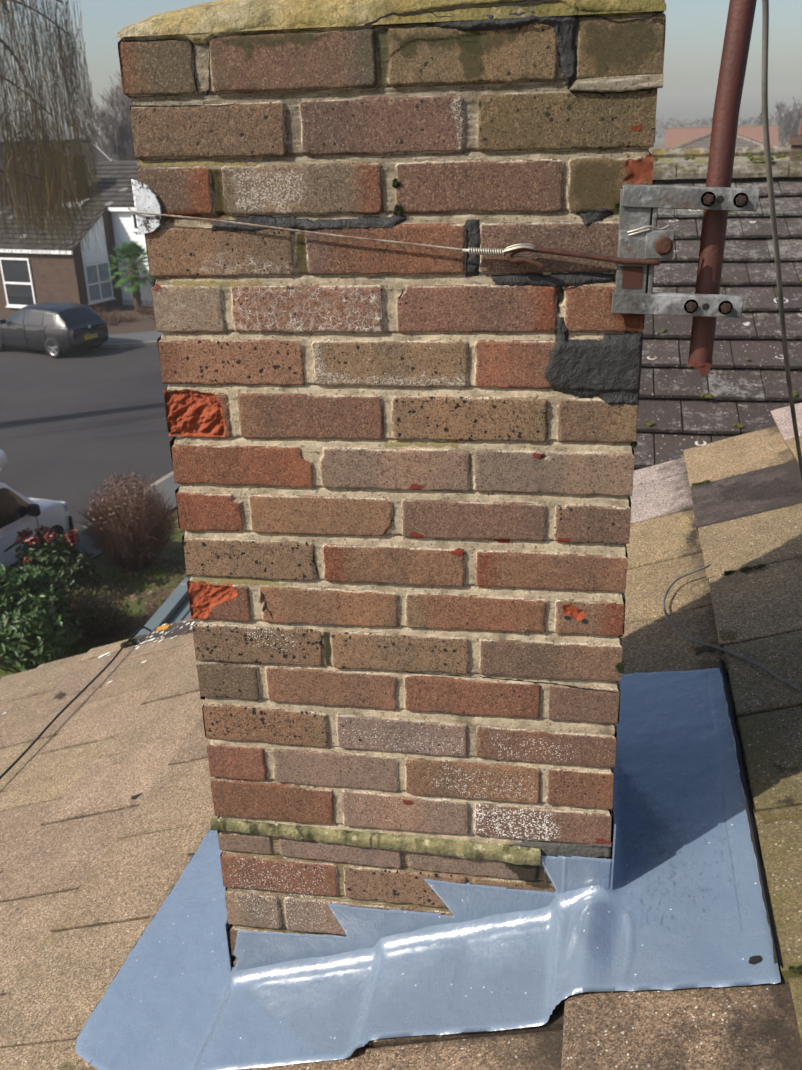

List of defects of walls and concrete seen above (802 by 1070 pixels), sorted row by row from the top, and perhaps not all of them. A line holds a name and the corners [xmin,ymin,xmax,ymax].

crack [343,0,554,30]
crack [578,14,658,23]
leakage [455,31,484,78]
spalling [163,389,225,438]
spalling [186,581,239,620]